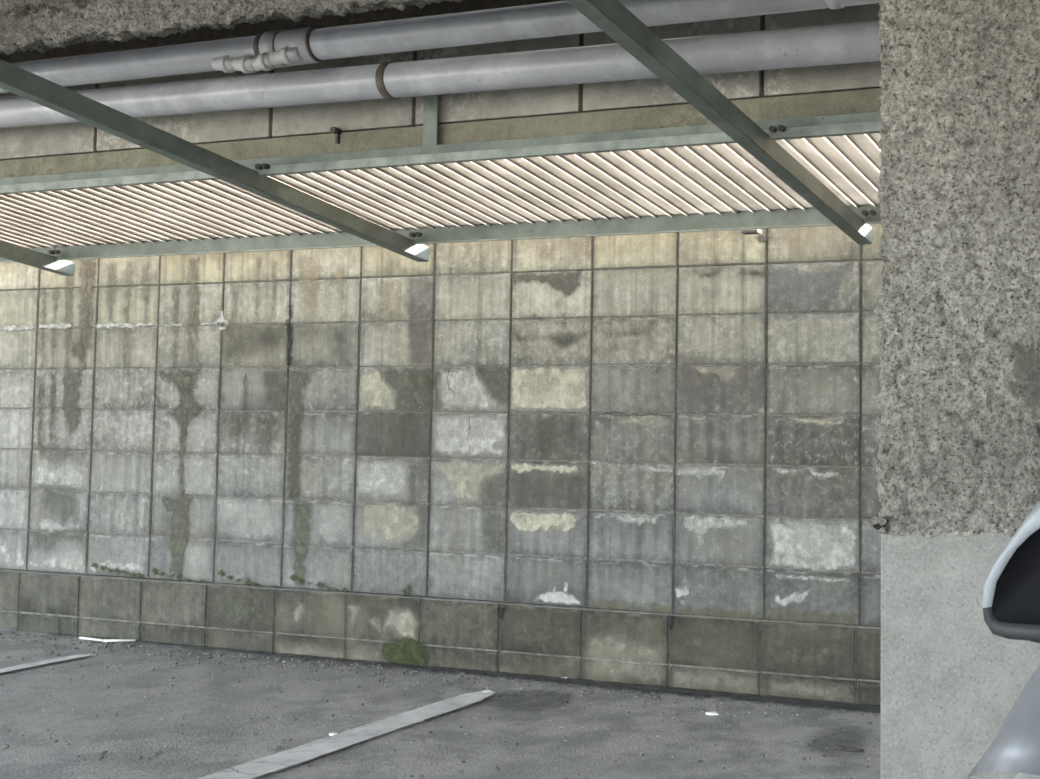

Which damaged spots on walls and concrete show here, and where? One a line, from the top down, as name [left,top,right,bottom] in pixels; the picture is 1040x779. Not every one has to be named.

water stain [0,259,217,572]
water stain [479,368,508,403]
water stain [256,371,309,585]
water stain [538,583,580,604]
water stain [775,575,843,606]
water stain [146,639,881,713]